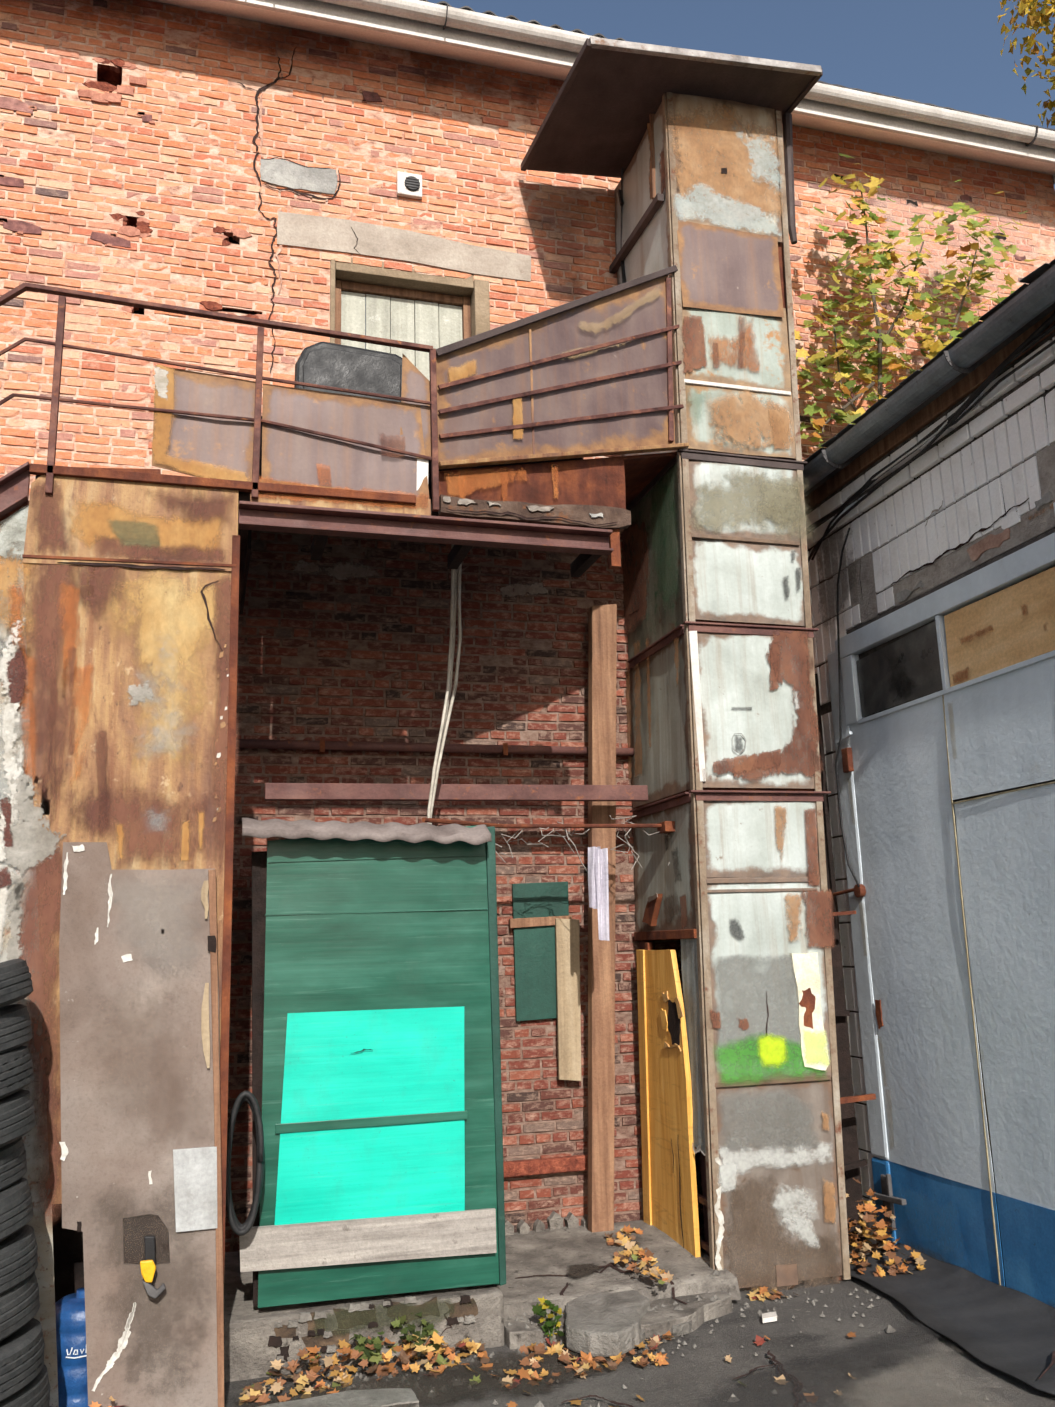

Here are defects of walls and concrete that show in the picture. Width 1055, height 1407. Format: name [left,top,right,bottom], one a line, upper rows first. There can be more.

spalling [78,57,155,125]
crack [237,47,341,373]
rust [647,103,781,223]
rust [682,315,760,373]
rust [152,364,425,508]
peeling [891,491,1054,606]
rust [0,483,237,864]
rust [713,629,821,780]
peeling [0,620,67,960]
rust [775,806,787,859]
rust [785,809,834,948]
peeling [715,1091,829,1271]